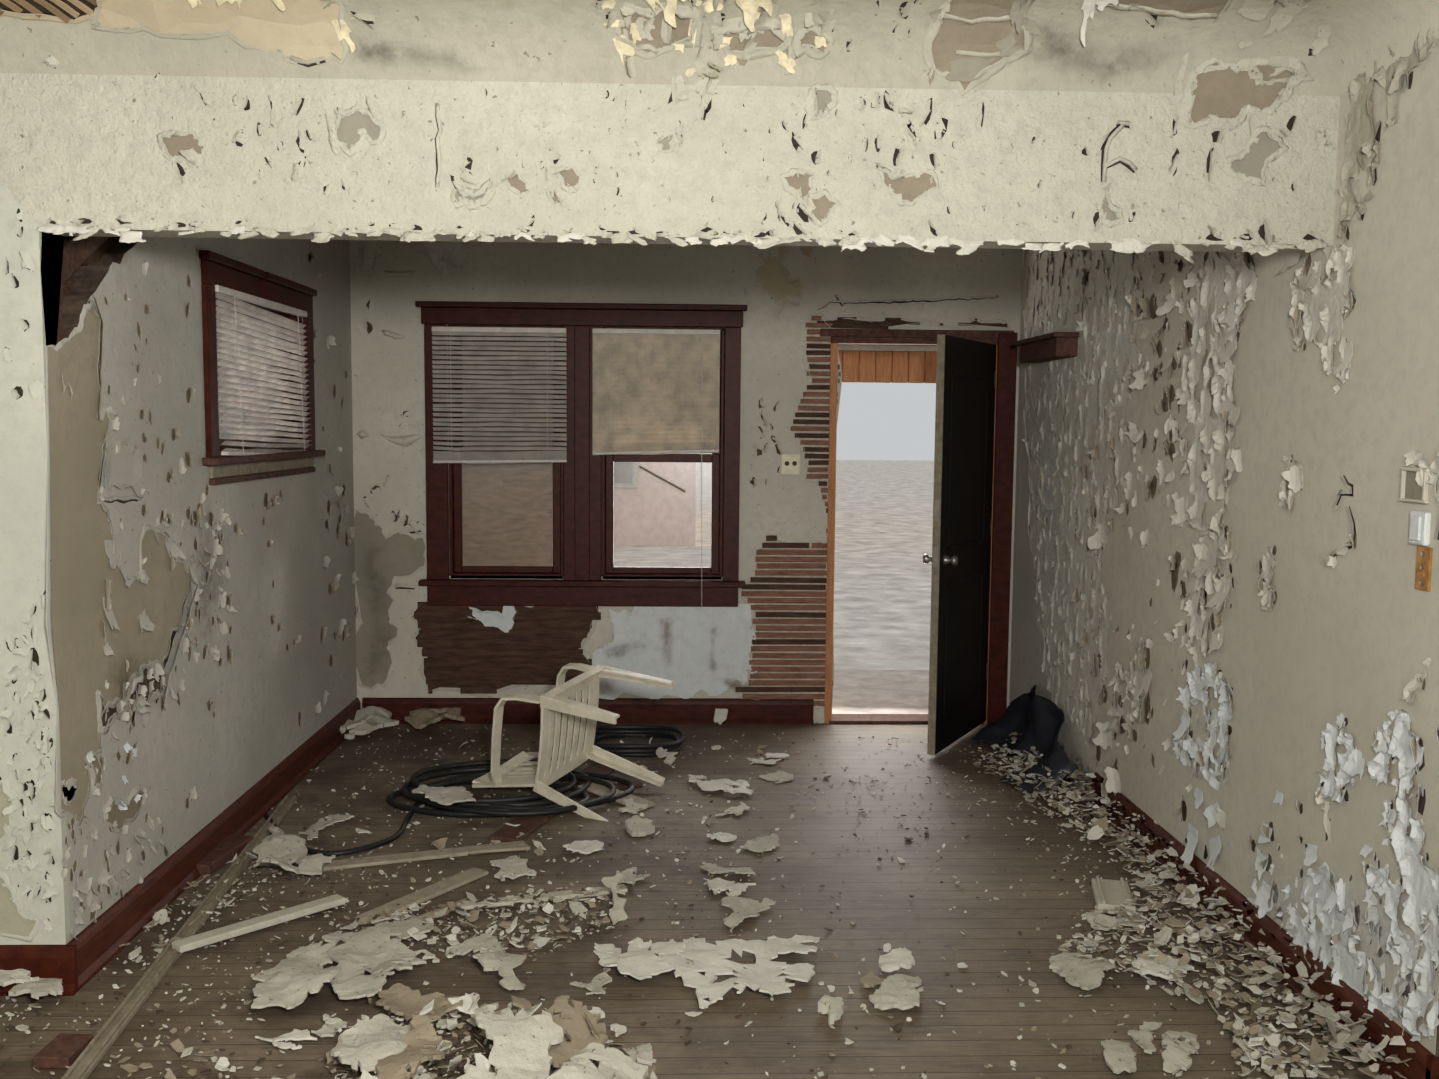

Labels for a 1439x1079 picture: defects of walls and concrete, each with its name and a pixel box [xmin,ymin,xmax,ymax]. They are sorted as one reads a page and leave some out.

peeling [156,130,206,185]
peeling [0,0,379,67]
peeling [0,209,243,942]
peeling [194,0,1439,881]
peeling [1237,658,1439,1042]